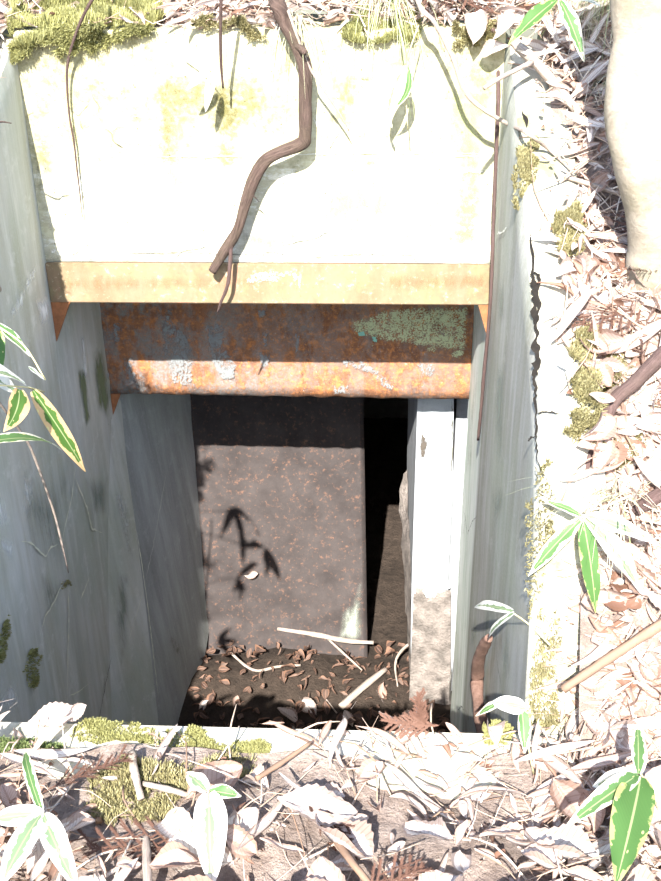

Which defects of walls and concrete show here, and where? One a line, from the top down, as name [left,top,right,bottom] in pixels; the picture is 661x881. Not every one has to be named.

crack [528,224,569,466]